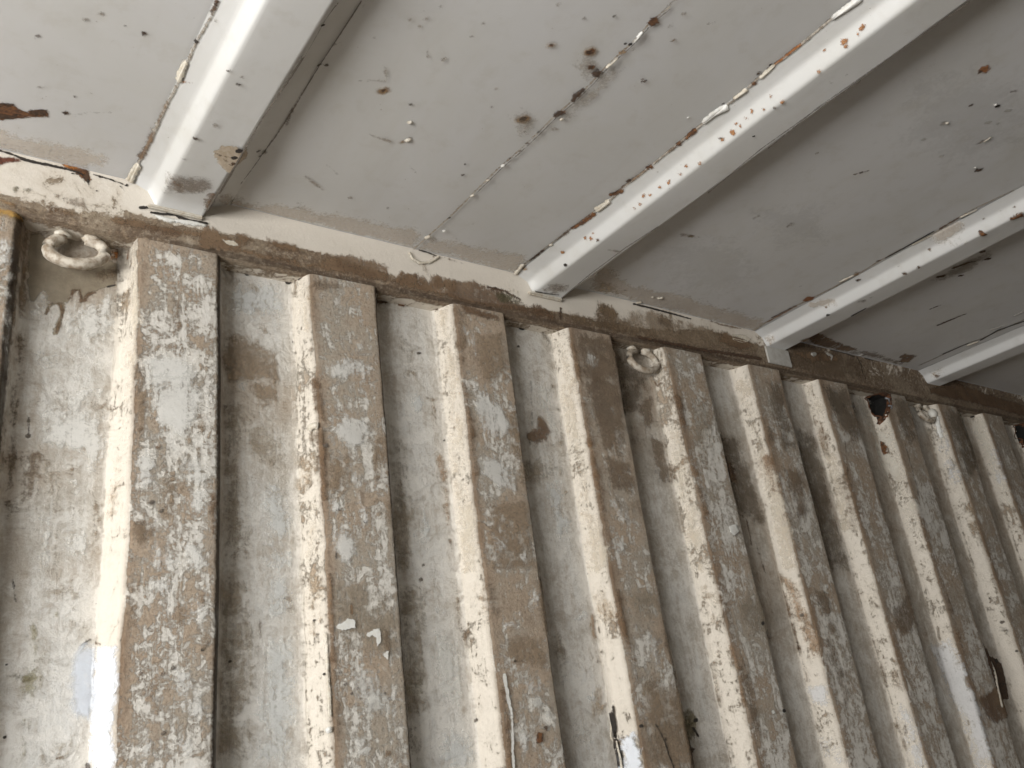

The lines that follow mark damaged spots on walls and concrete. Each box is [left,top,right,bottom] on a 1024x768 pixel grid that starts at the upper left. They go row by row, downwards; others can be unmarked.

corrosion [584,48,603,77]
corrosion [63,164,92,182]
corrosion [609,164,653,196]
water stain [19,234,117,335]
corrosion [557,212,599,266]
peeling [130,353,212,434]
peeling [312,378,384,511]
spalling [859,395,905,491]
peeling [327,574,394,710]
peeling [609,633,693,768]
peeling [931,639,993,768]
corrosion [979,649,1009,724]